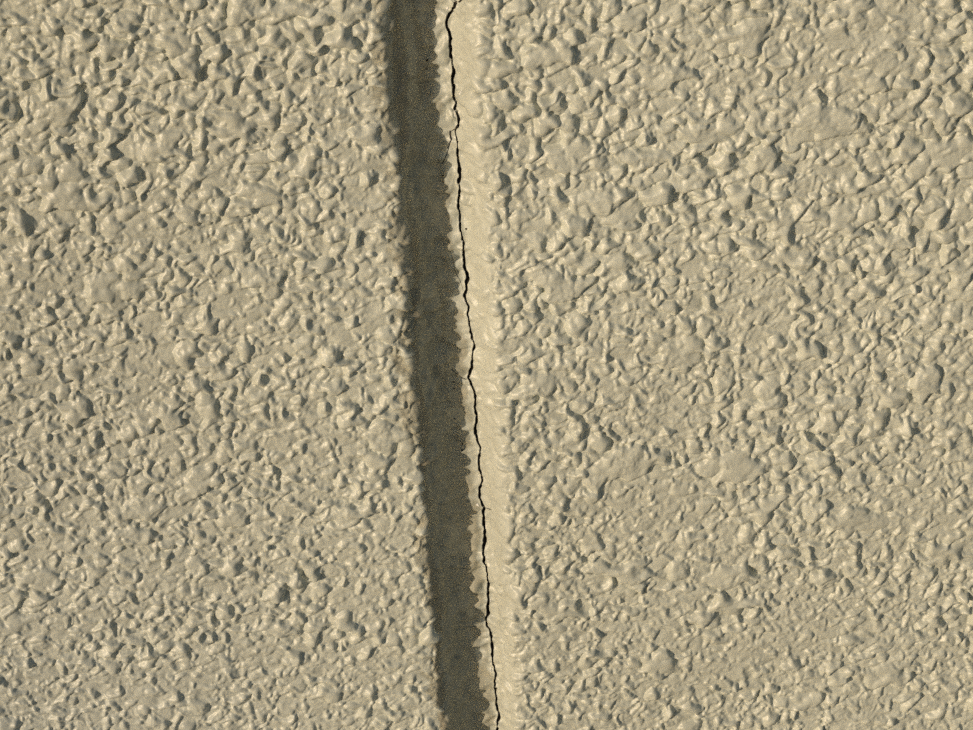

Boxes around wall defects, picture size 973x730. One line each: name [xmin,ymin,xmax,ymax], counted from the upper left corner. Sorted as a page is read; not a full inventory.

crack [441,0,501,730]